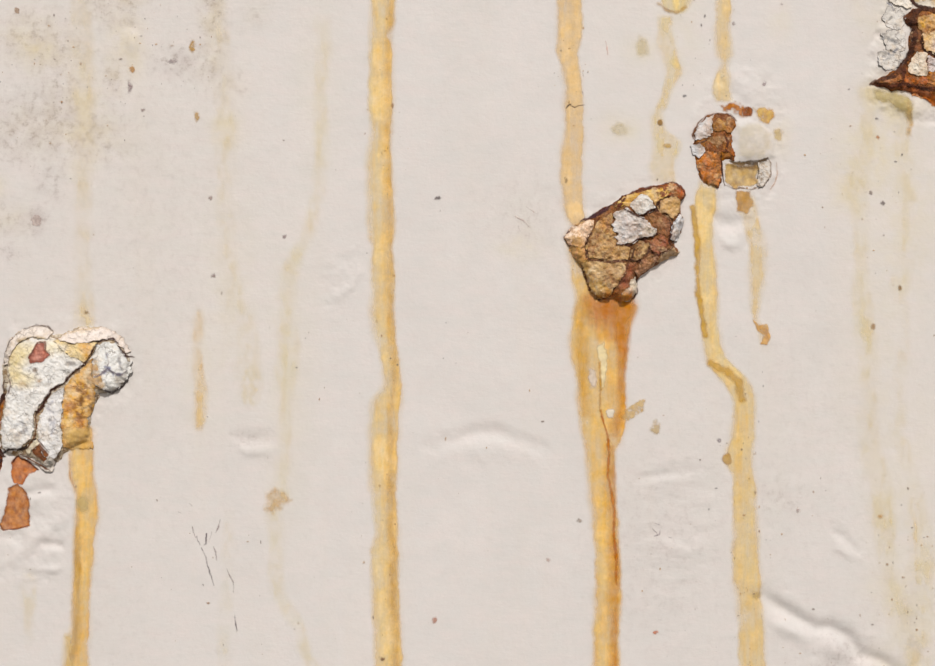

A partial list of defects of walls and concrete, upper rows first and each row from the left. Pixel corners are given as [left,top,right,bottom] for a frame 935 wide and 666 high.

rust [557,0,584,224]
peeling [553,60,794,317]
peeling [859,0,935,134]
peeling [0,311,147,590]
rust [571,237,645,666]